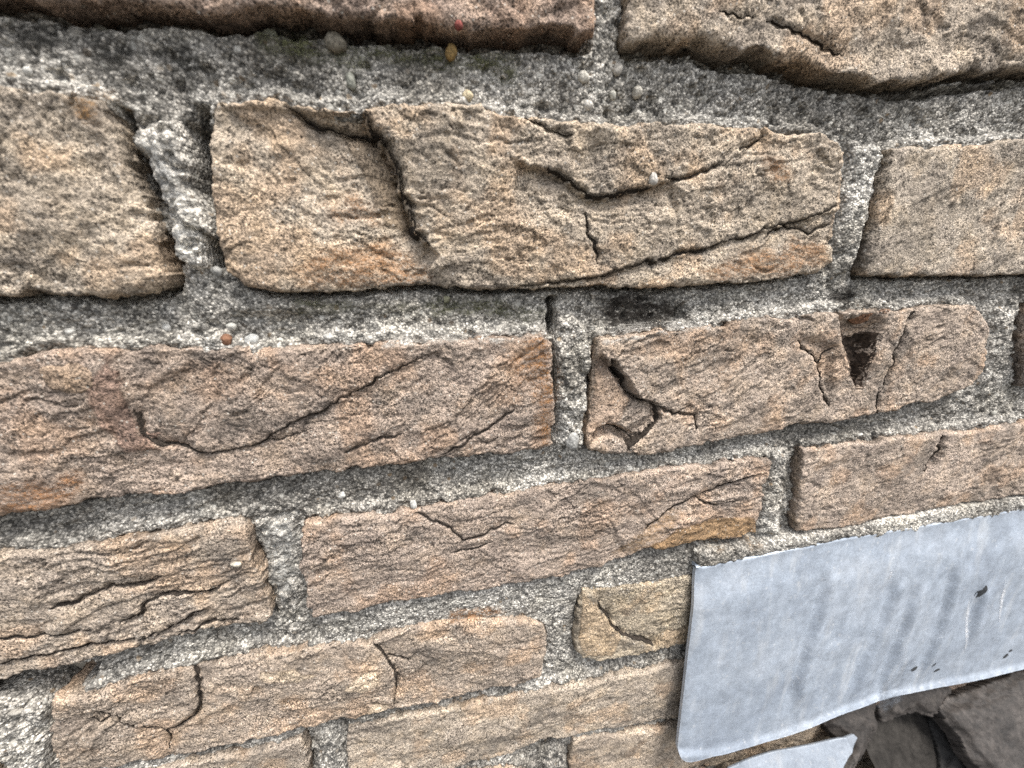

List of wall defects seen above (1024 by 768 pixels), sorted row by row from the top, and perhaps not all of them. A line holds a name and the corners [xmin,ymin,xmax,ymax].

crack [524,117,574,137]
crack [286,106,430,246]
crack [520,137,836,287]
peeling [848,309,890,324]
crack [133,354,428,454]
crack [599,360,697,451]
crack [797,340,832,406]
crack [875,311,915,413]
crack [415,512,514,553]
crack [0,575,240,665]
crack [597,600,654,646]